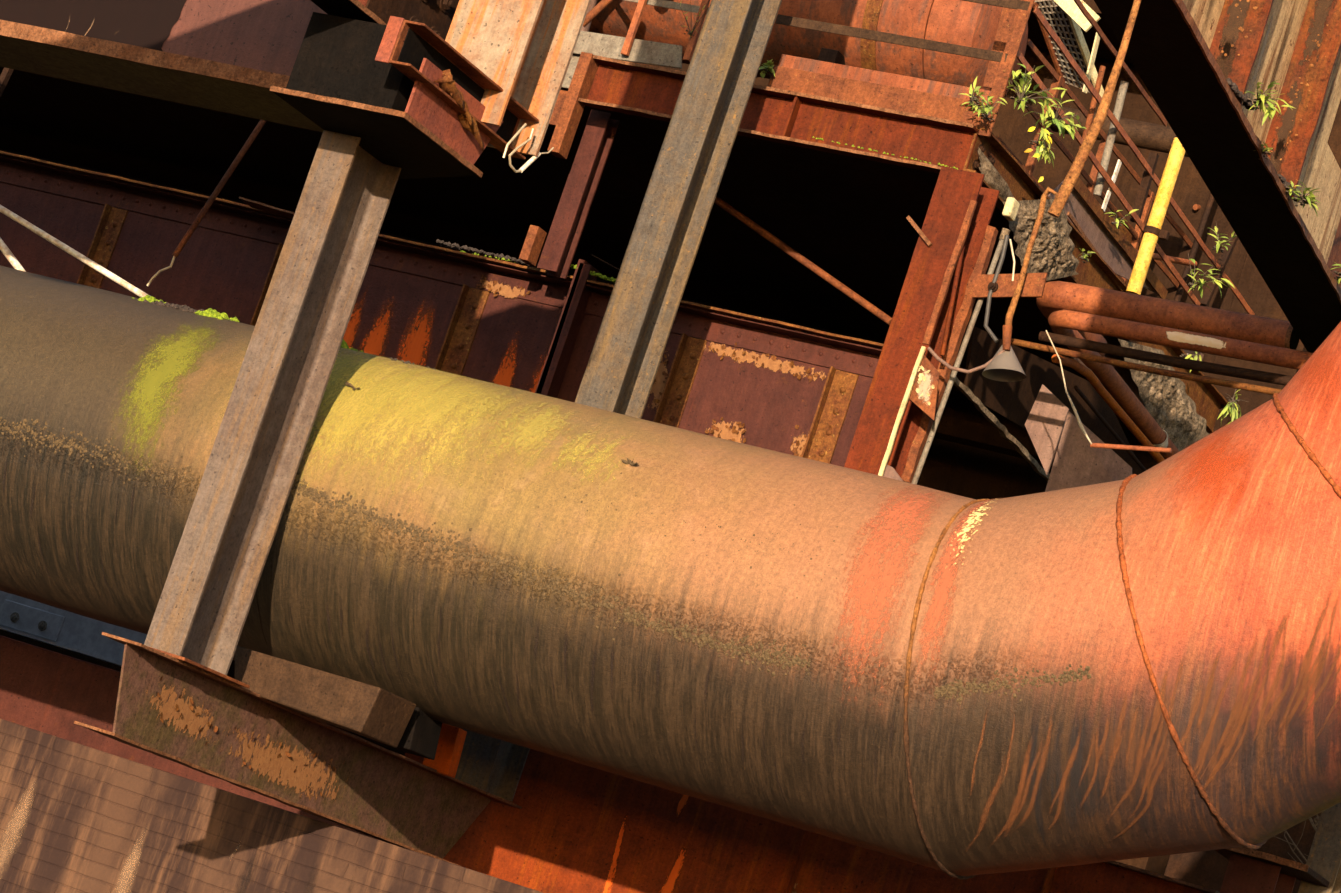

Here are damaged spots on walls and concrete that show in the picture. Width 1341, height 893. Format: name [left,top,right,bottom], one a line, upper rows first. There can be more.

corrosion [1270,0,1337,174]
corrosion [343,300,433,366]
corrosion [492,345,516,387]
peeling [647,354,669,409]
peeling [700,337,826,382]
peeling [705,417,746,443]
peeling [790,425,832,459]
corrosion [1181,608,1341,782]
corrosion [975,725,1051,839]
corrosion [1053,668,1181,831]
corrosion [603,817,626,893]
corrosion [661,848,686,893]